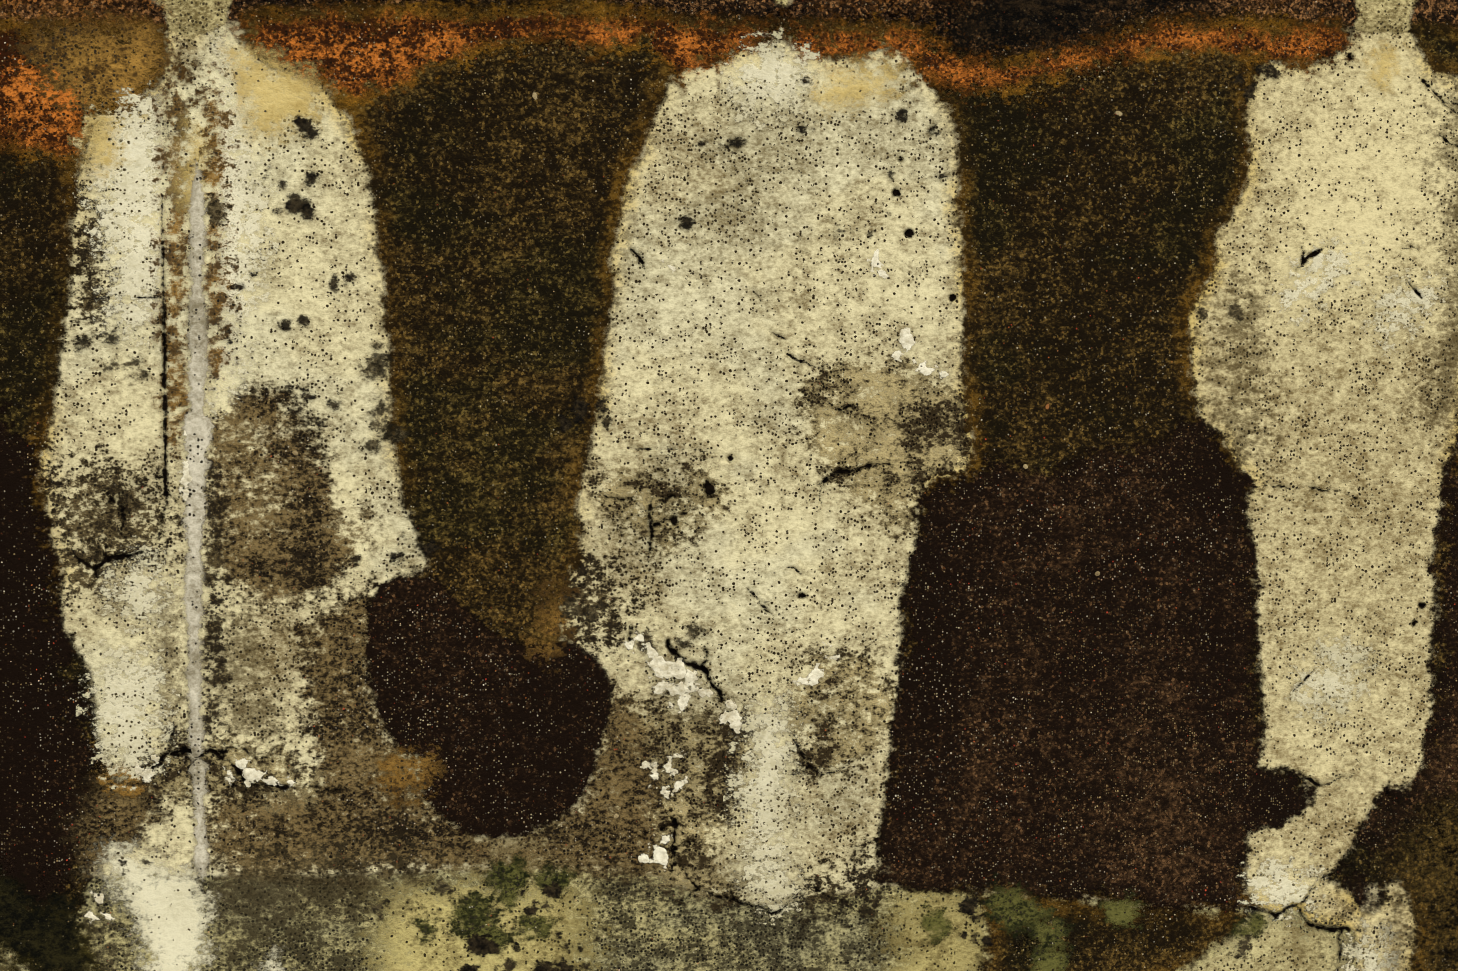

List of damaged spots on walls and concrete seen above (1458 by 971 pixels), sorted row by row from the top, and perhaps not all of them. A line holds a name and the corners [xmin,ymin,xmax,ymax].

crack [666,639,723,701]
flaking render [624,632,756,921]
crack [1245,874,1359,971]
crack [1429,817,1458,953]